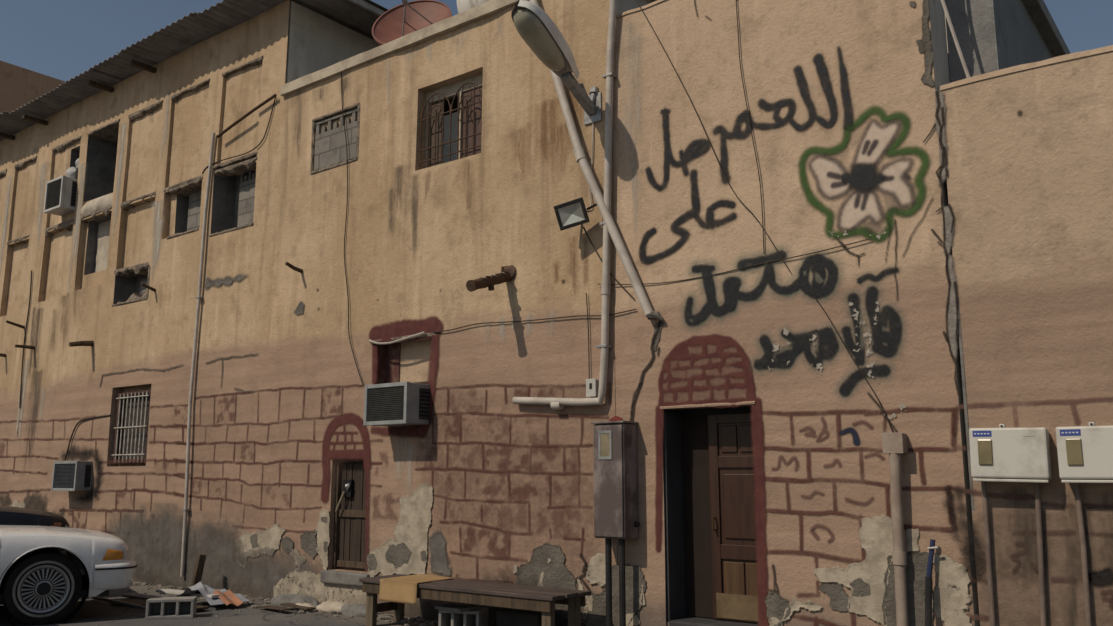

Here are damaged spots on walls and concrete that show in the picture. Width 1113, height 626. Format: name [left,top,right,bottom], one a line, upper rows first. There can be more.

peeling [235,484,433,604]
spalling [513,543,646,626]
peeling [765,515,973,626]